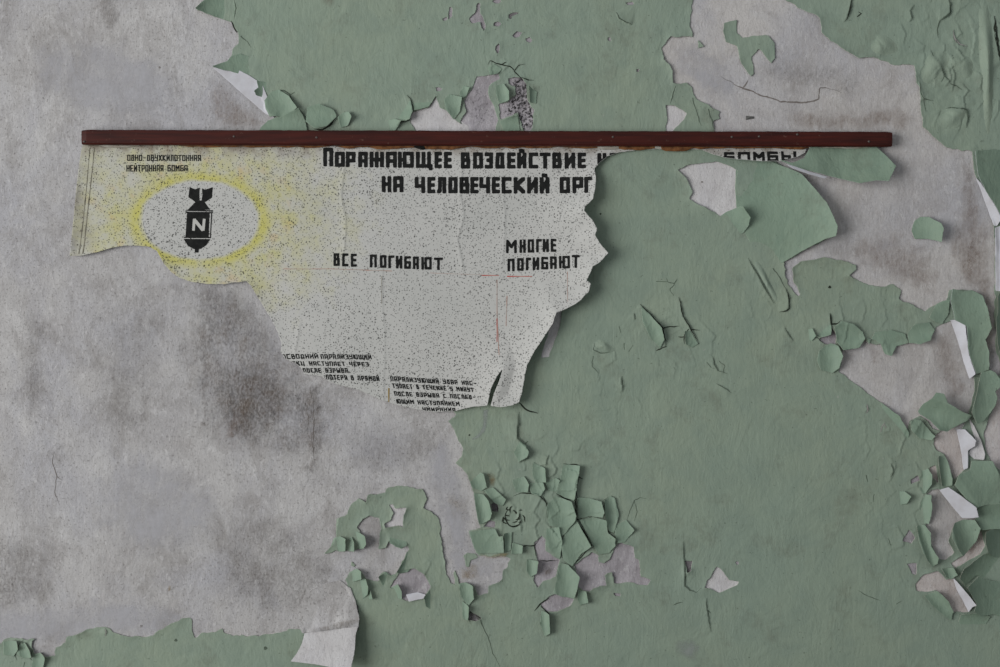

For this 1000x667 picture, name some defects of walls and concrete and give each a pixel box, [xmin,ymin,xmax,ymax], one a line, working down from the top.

peeling [0,0,650,667]
crack [502,403,646,564]
peeling [641,307,664,348]
peeling [662,0,1000,624]